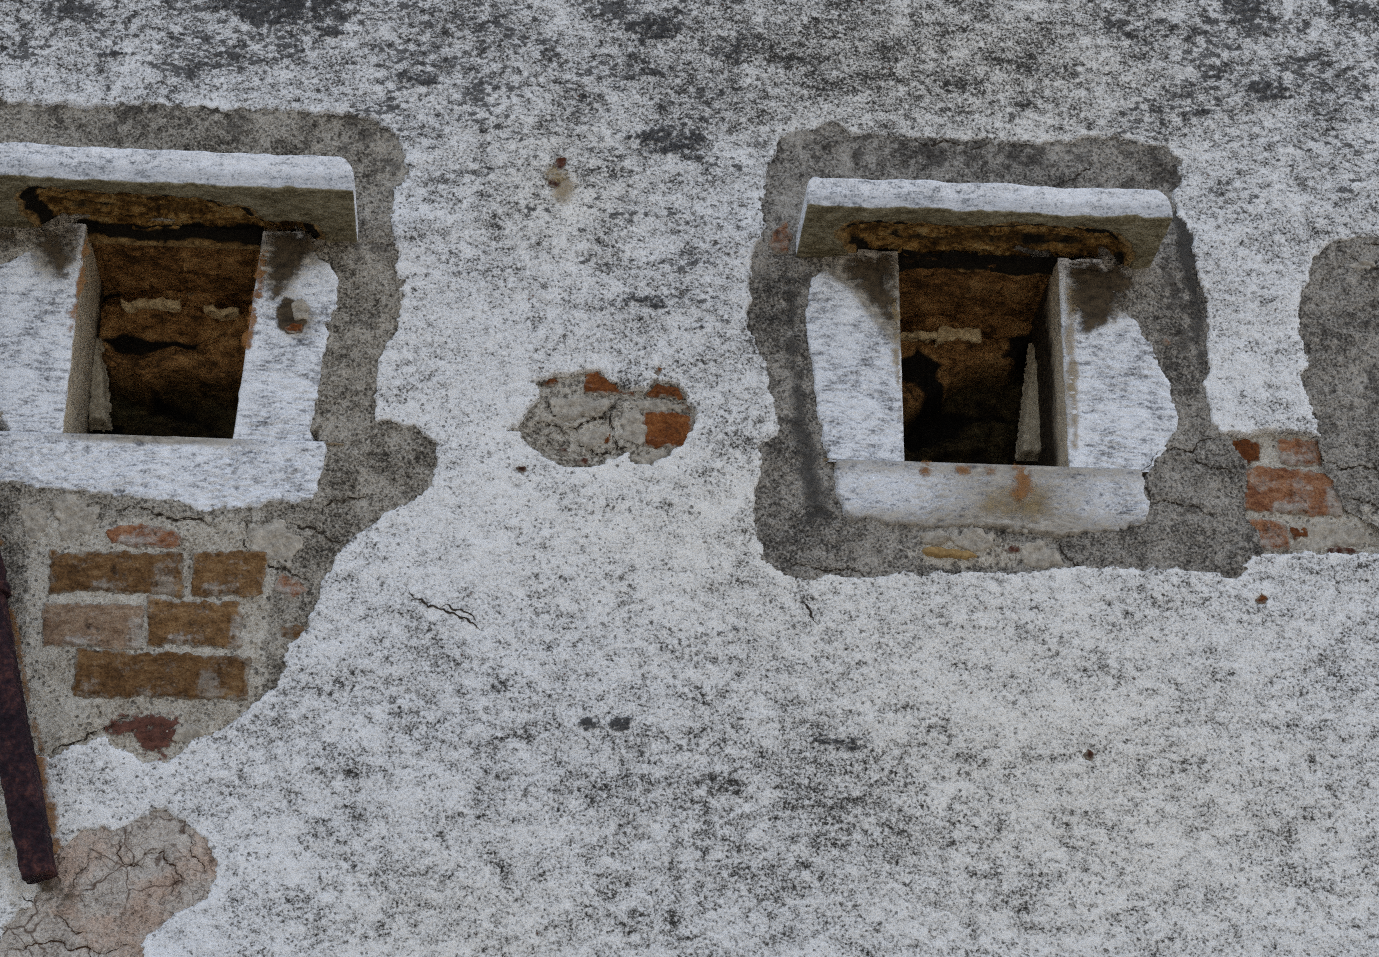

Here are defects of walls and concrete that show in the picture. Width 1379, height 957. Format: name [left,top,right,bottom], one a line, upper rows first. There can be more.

spalling [0,99,437,764]
spalling [511,366,697,467]
spalling [746,124,1379,583]
crack [406,586,484,631]
corrosion [35,727,61,853]
spalling [0,810,218,957]